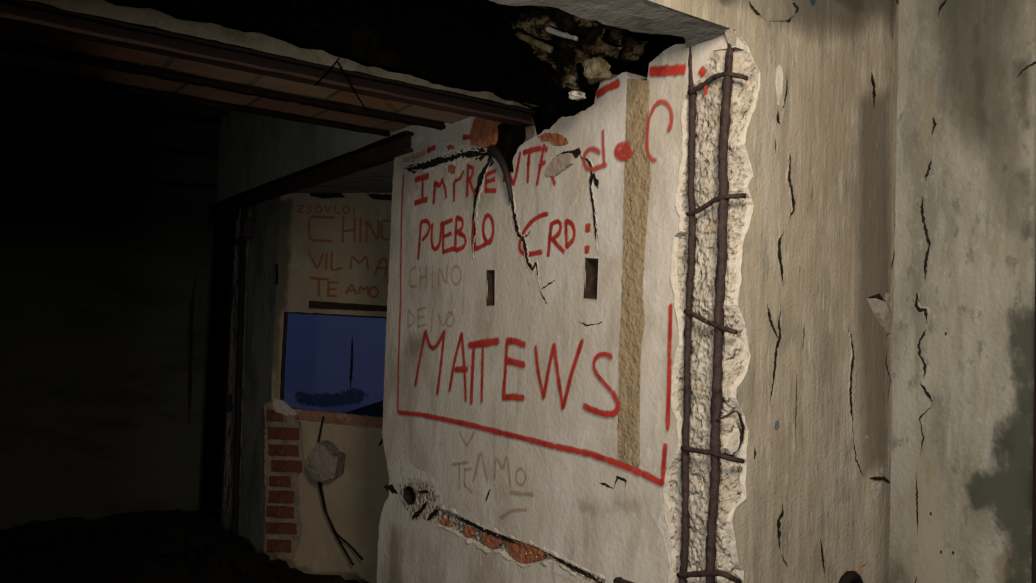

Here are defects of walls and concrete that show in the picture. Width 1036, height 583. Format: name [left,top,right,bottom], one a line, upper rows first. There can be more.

flaking render [511,5,648,91]
flaking render [775,65,788,111]
flaking render [264,388,368,561]
crack [404,146,494,259]
flaking render [390,452,606,583]
crack [510,183,555,303]
crack [580,153,599,251]
spalling [657,28,760,583]
crack [767,111,805,429]
crack [847,325,863,476]
crack [912,161,933,535]
leakage [967,312,1035,583]